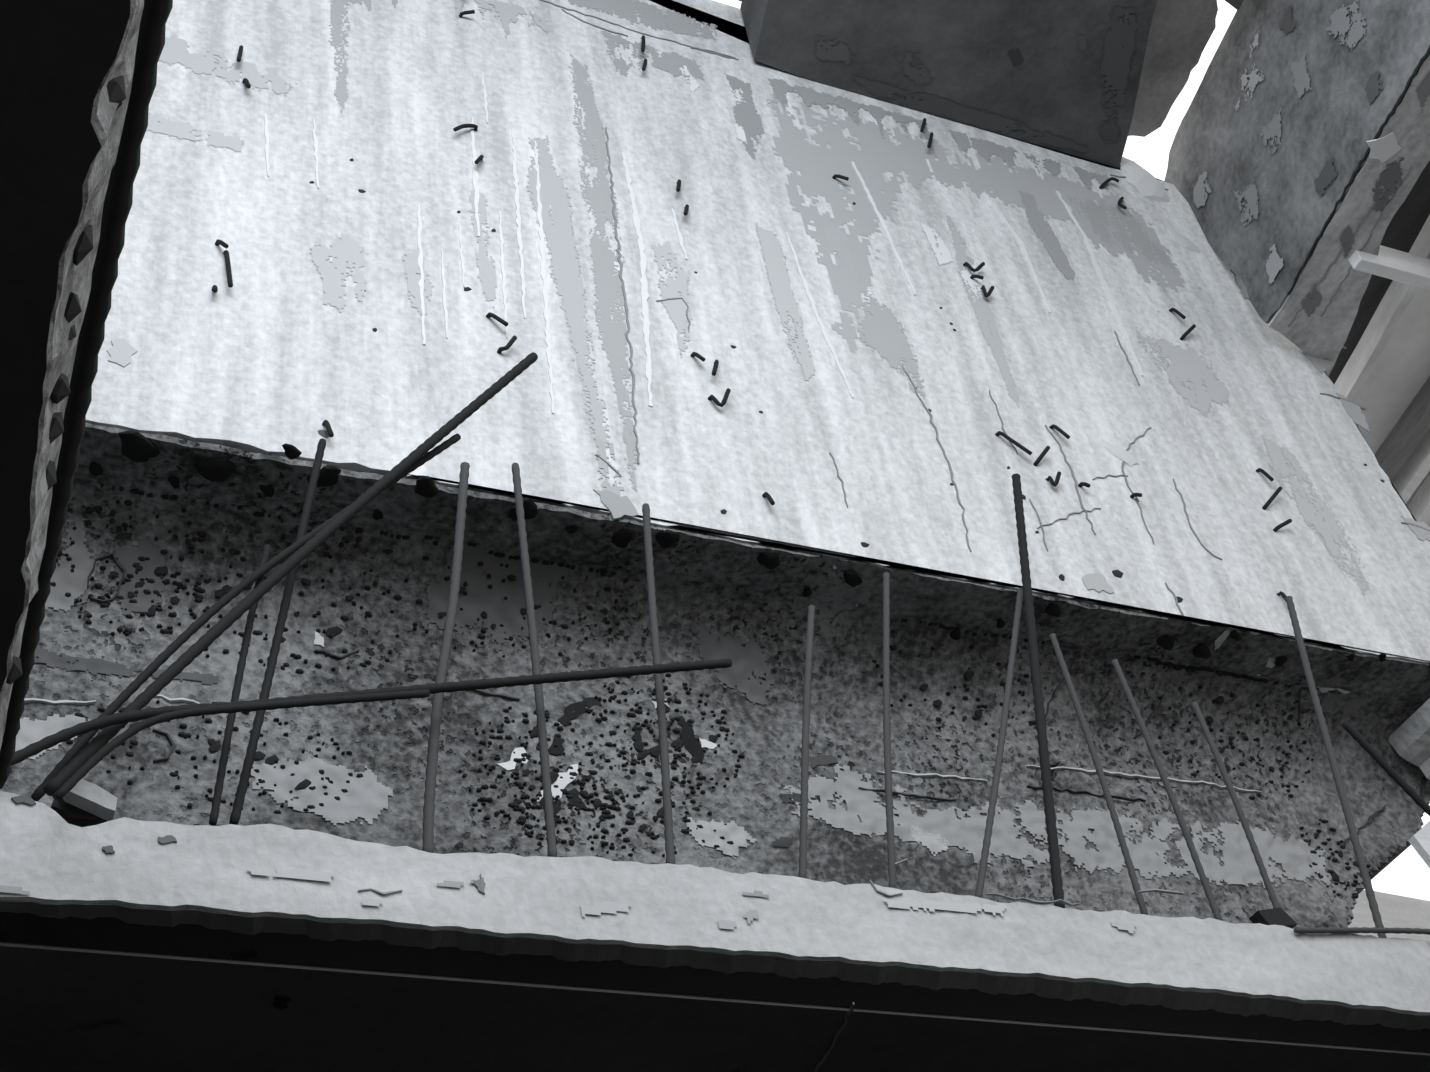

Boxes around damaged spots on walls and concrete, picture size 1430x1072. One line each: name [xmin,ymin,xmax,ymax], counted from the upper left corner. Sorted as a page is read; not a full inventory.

damp [724,6,1230,417]
crack [902,365,972,552]
crack [989,390,1018,455]
crack [1029,425,1154,552]
crack [1173,478,1223,560]
spalling [1336,393,1370,433]
peeling [783,473,1430,938]
spalling [472,877,486,895]